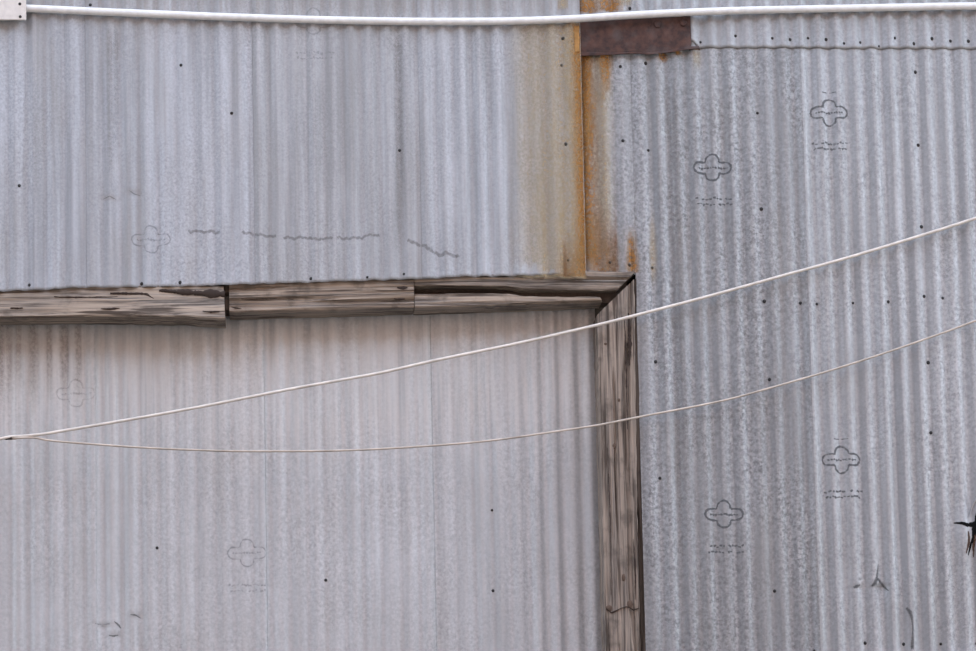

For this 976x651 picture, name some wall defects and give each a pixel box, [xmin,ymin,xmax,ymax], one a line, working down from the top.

rust [579,0,619,13]
rust [564,25,616,276]
rust [628,238,637,271]